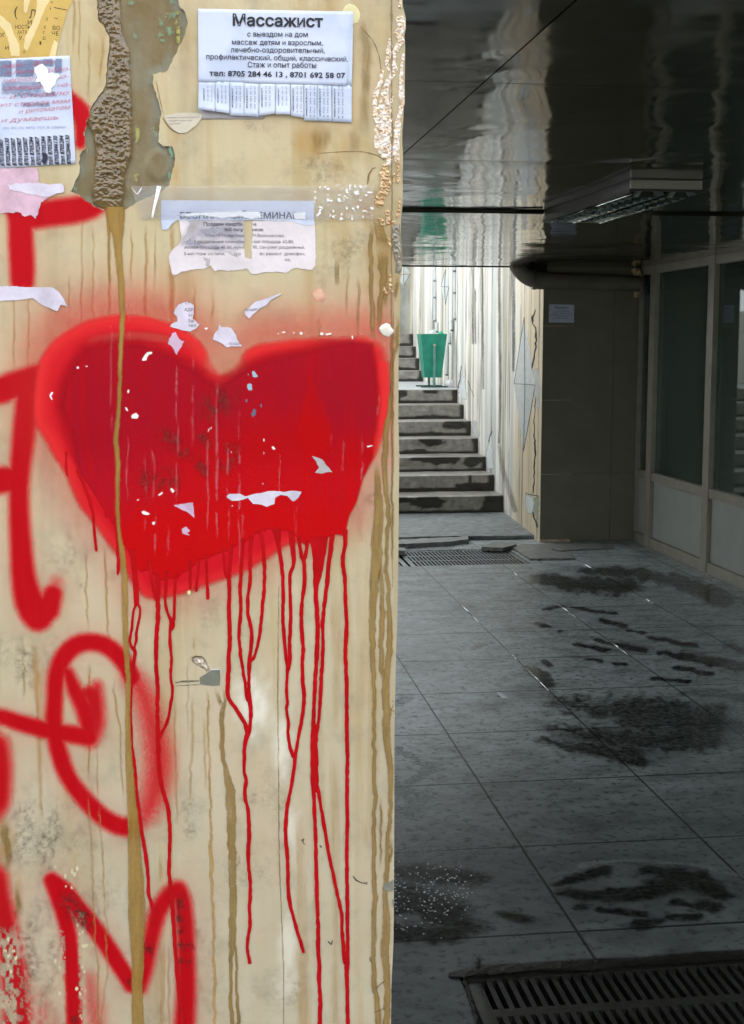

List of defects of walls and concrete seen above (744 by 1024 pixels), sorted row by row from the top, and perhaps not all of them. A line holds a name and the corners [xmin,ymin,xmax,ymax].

damp [472,269,484,357]
crack [530,311,538,368]
crack [526,397,539,527]
damp [369,324,491,1024]
damp [523,660,744,766]
damp [531,565,744,683]
damp [498,911,533,922]
damp [554,860,733,931]